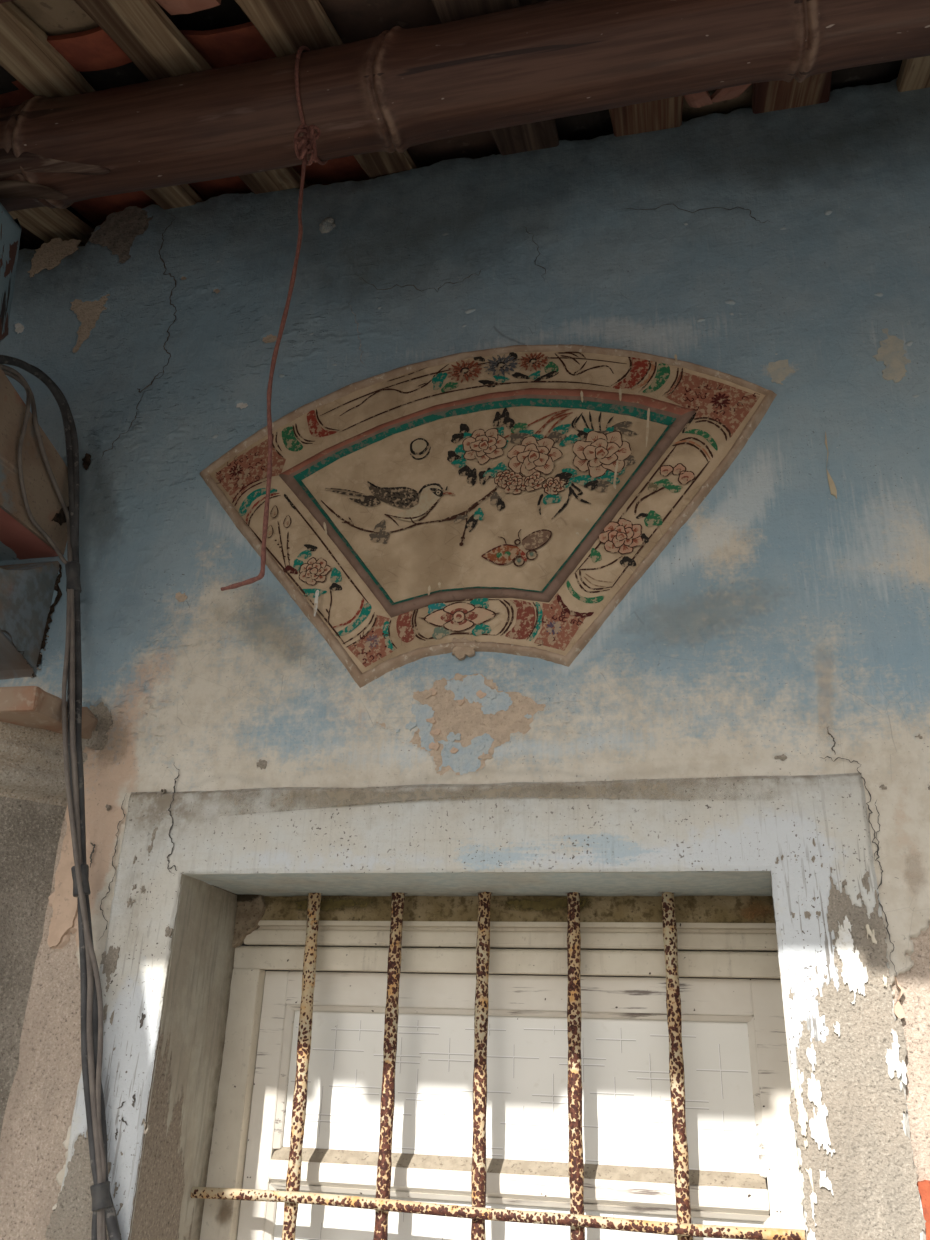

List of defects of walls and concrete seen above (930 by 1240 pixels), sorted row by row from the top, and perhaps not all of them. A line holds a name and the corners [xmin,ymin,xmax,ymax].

peeling [28,206,153,278]
peeling [70,294,110,353]
crack [102,215,177,457]
peeling [376,673,547,776]
crack [166,765,180,872]
crack [821,727,898,988]
spalling [0,803,109,1240]
peeling [100,945,120,1025]
peeling [775,838,930,1240]